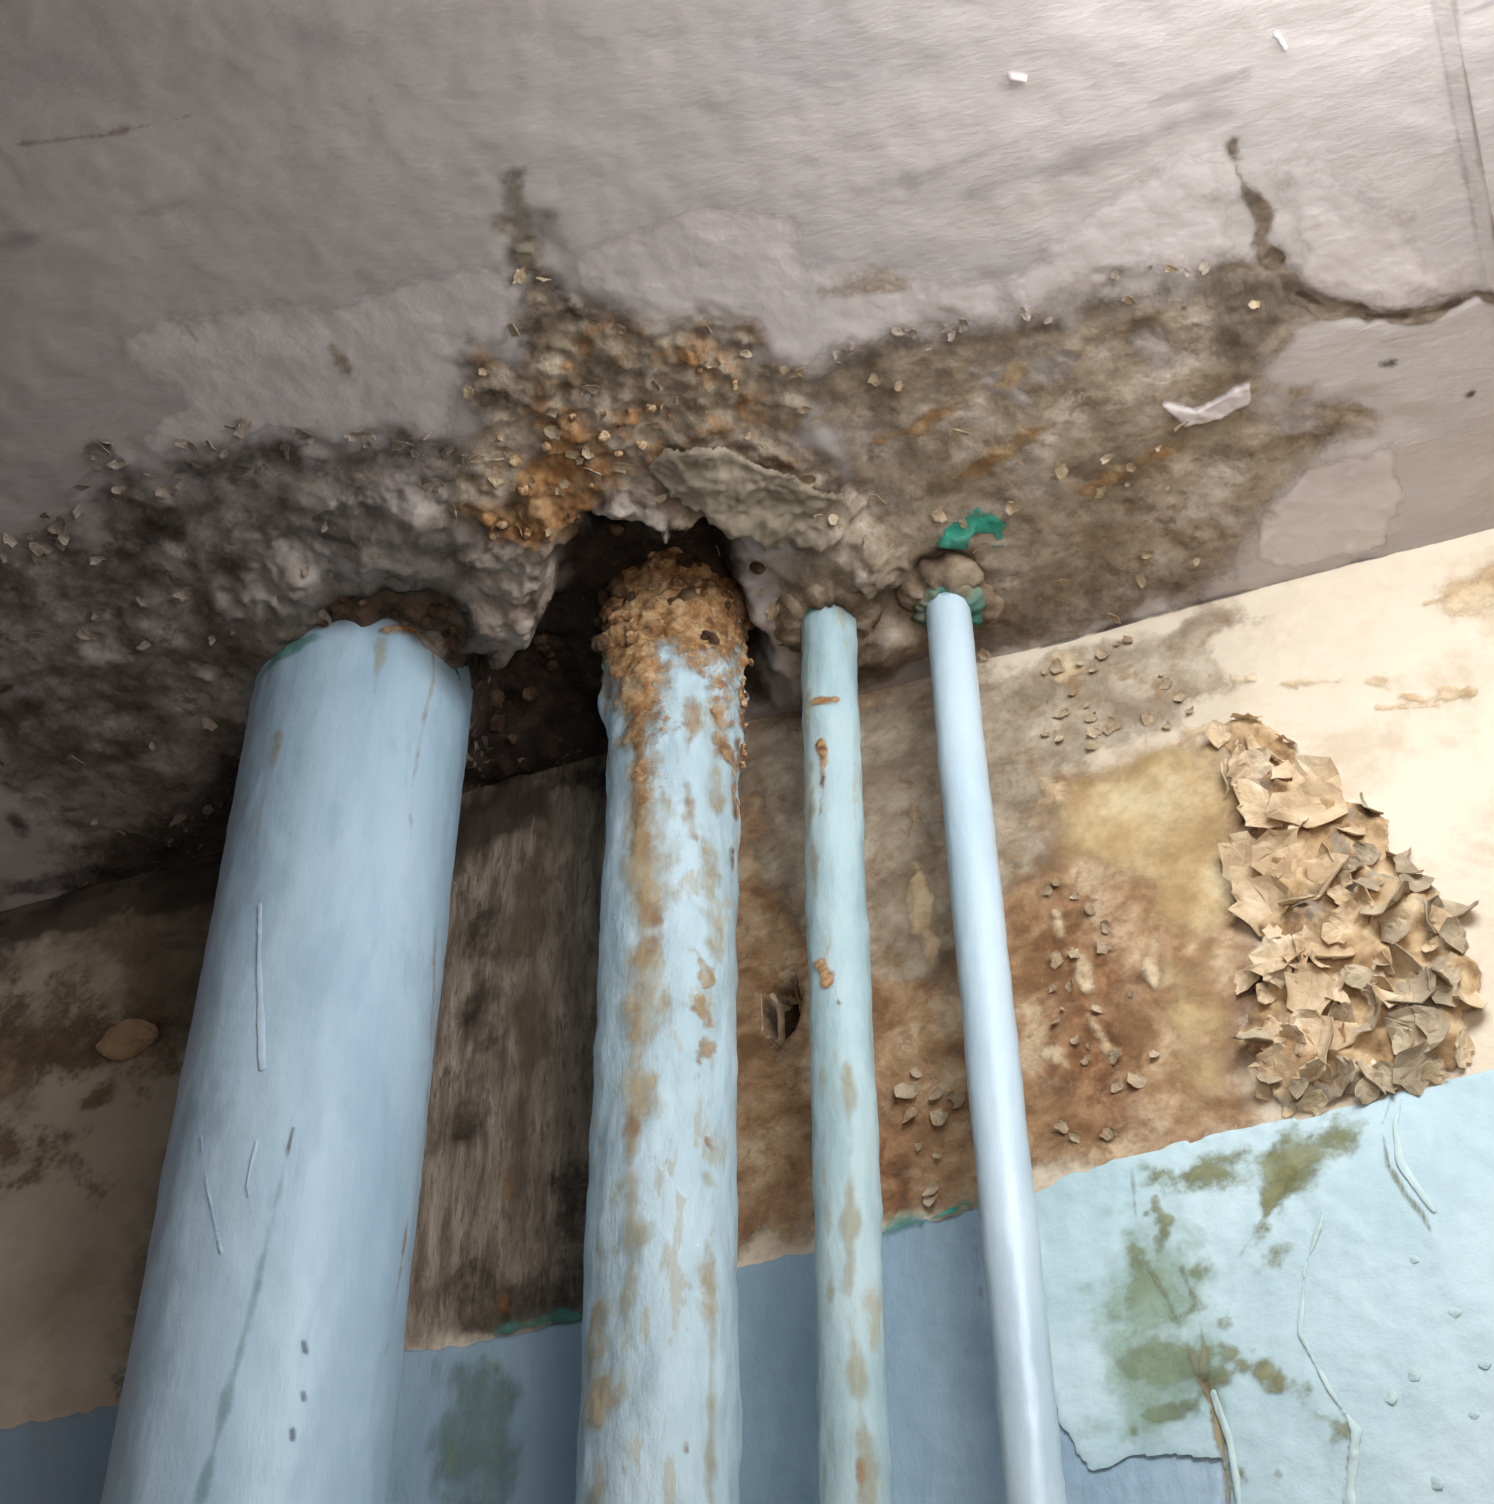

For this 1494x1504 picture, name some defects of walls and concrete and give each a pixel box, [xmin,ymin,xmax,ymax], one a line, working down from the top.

crack [1466,80,1482,164]
crack [1228,139,1494,325]
peeling [1375,685,1477,709]
leakage [0,417,609,1344]
leakage [757,258,1375,1434]
leakage [736,704,815,1251]
peeling [1034,712,1494,1504]
leakage [436,1363,516,1504]
mould [1335,1421,1350,1437]